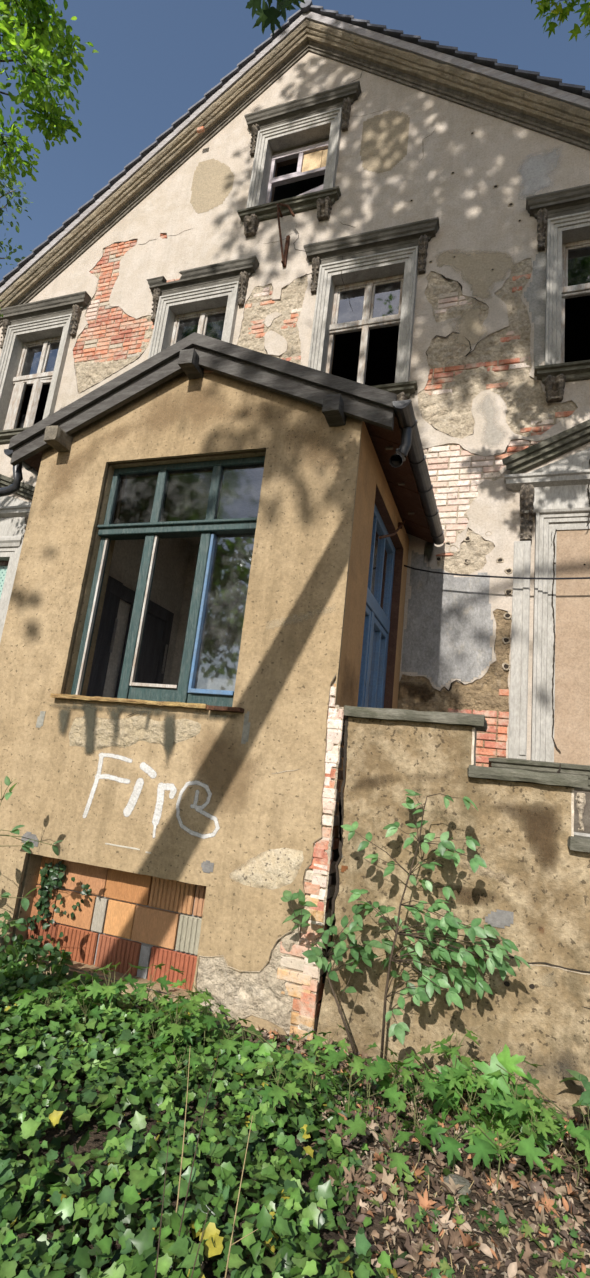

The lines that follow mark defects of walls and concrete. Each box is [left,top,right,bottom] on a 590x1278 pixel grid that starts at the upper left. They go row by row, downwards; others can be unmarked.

flaking render [73,239,155,393]
flaking render [237,275,308,365]
flaking render [418,259,577,575]
damp [58,703,175,759]
flaking render [397,589,513,767]
crack [551,459,590,773]
flaking render [195,673,347,1040]
crack [483,950,590,975]